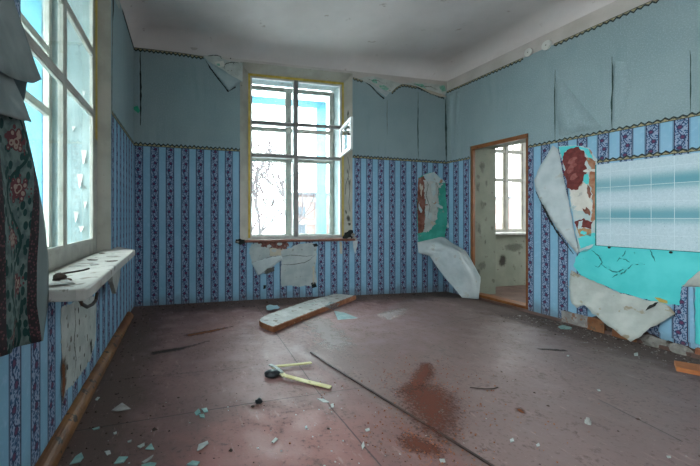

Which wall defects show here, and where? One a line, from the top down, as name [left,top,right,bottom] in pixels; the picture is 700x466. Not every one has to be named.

flaking render [204,55,243,92]
flaking render [235,239,318,288]
peeling [417,172,481,299]
peeling [534,145,700,356]
crack [593,250,655,277]
flaking render [60,296,97,398]